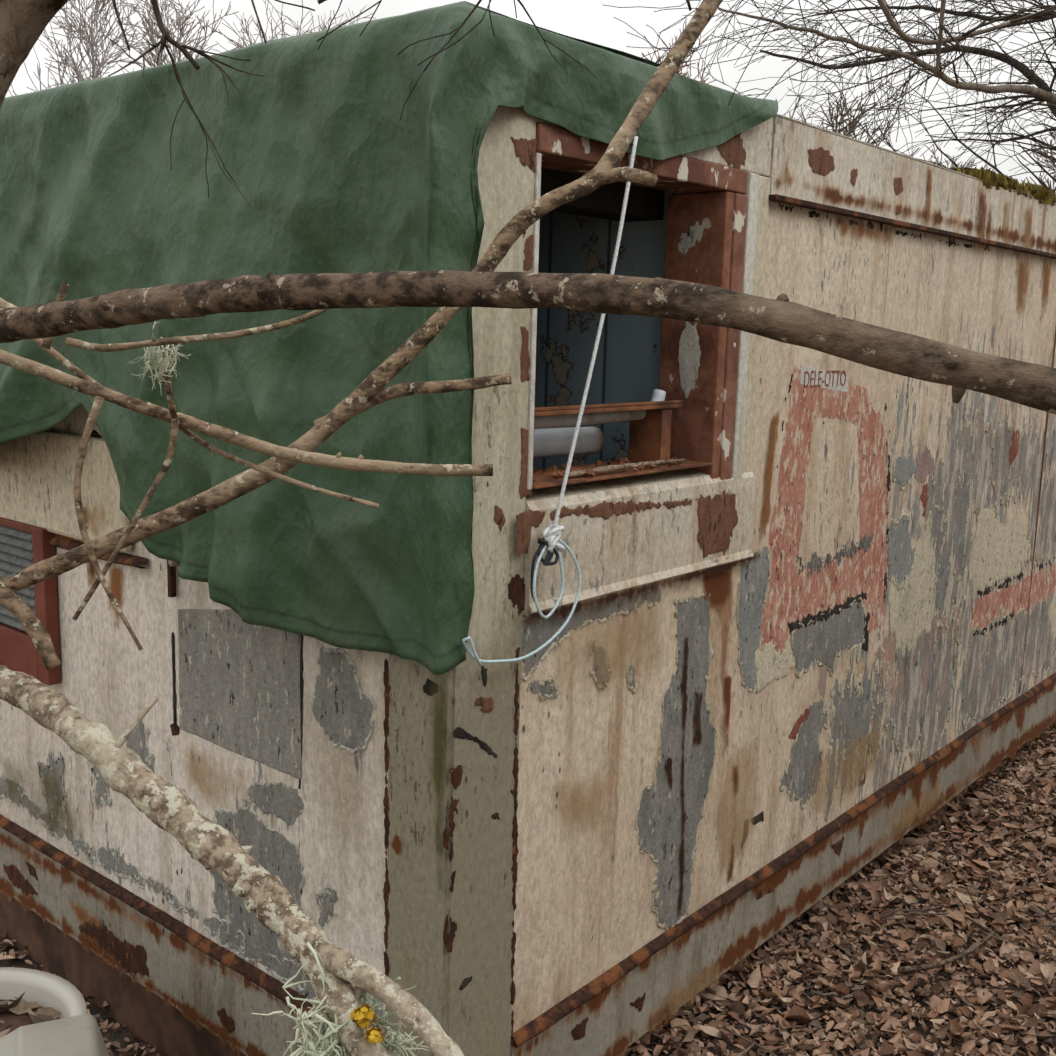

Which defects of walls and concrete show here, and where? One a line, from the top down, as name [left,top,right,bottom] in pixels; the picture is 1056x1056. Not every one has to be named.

rust [807,147,1056,310]
peeling [678,322,701,398]
peeling [737,399,1056,822]
rust [0,833,266,1056]
peeling [126,719,155,772]
peeling [0,749,317,1000]
peeling [178,609,376,911]
rust [383,659,401,976]
rust [568,976,626,1040]
peeling [521,587,717,931]
rust [604,1030,634,1056]
rust [630,637,1056,1031]